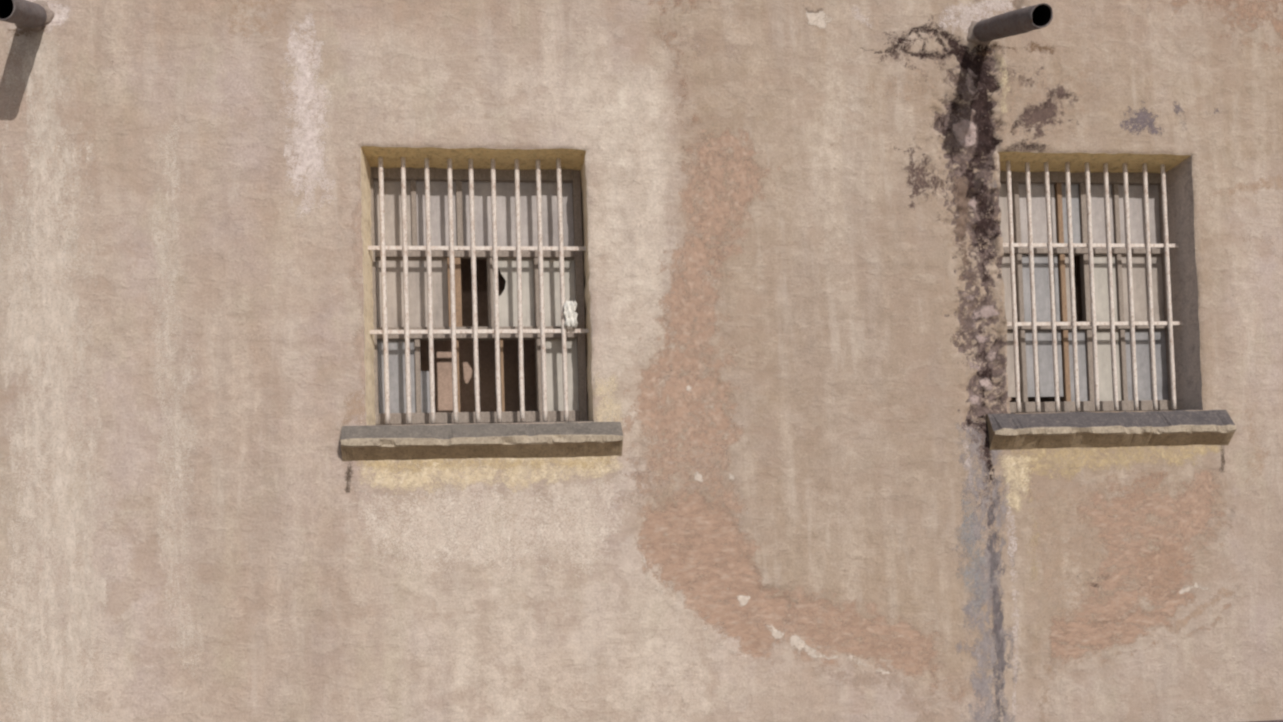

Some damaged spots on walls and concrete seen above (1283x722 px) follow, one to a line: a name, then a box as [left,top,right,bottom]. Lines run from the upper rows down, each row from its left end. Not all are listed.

leakage [805,11,833,29]
leakage [938,0,1030,41]
leakage [1147,0,1283,54]
leakage [996,54,1101,152]
leakage [1120,102,1164,136]
leakage [894,136,948,211]